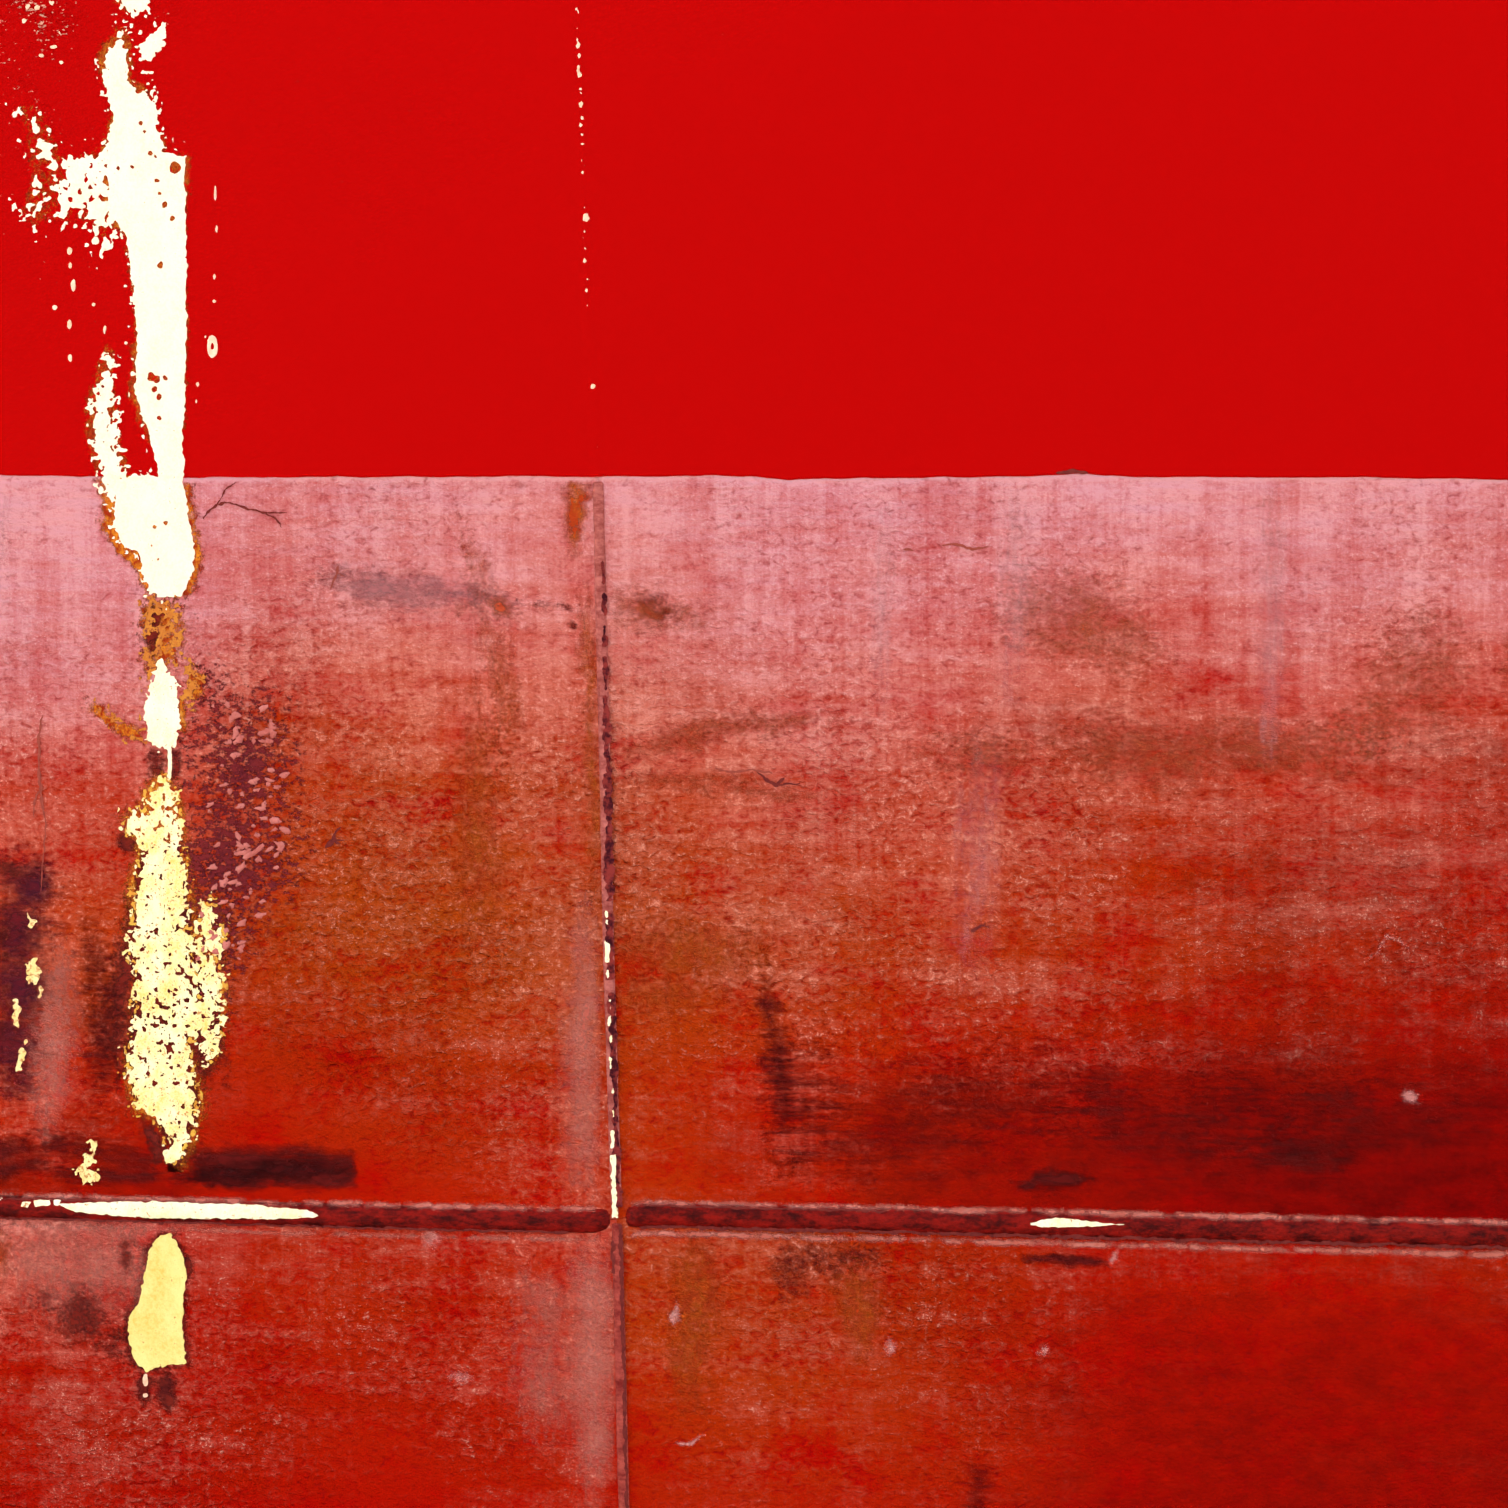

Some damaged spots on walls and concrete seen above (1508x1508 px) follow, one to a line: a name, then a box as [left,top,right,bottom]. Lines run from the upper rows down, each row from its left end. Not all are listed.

peeling [5,0,218,610]
rust [83,589,207,780]
water stain [0,861,54,1097]
water stain [83,944,117,1078]
rust [116,832,135,851]
peeling [101,658,233,1171]
peeling [21,1139,318,1411]
spalling [1030,1217,1124,1228]